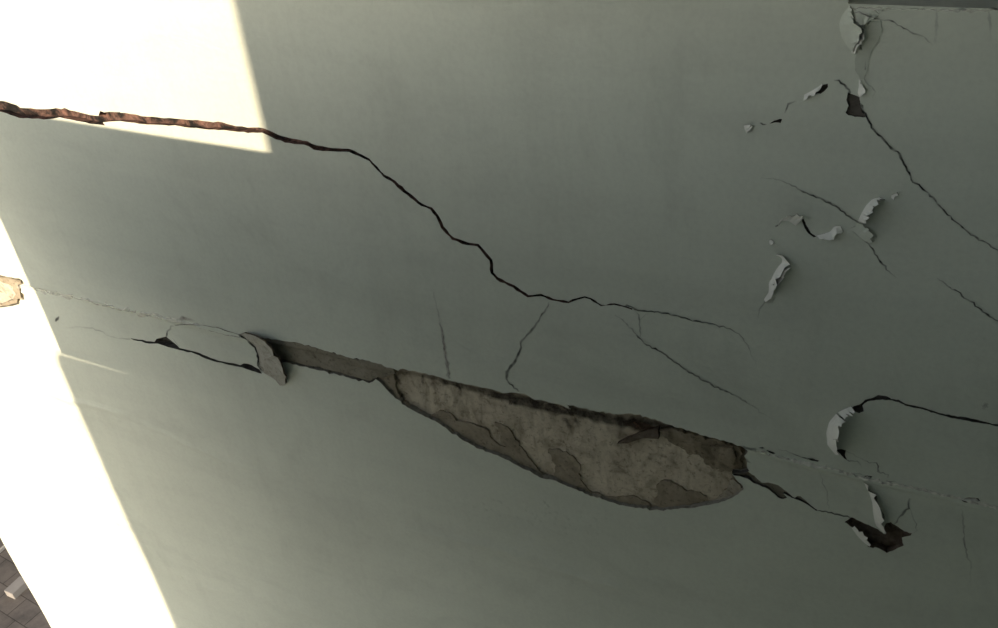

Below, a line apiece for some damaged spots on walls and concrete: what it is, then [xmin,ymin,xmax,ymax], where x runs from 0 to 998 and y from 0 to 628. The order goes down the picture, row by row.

peeling [839,5,882,97]
peeling [803,83,828,101]
crack [838,80,995,249]
flaking render [0,275,24,308]
crack [0,101,723,387]
peeling [764,239,791,302]
peeling [776,191,898,265]
crack [637,336,732,395]
flaking render [239,332,748,511]
crack [826,395,998,461]
crack [732,469,849,517]
flaking render [845,482,912,553]